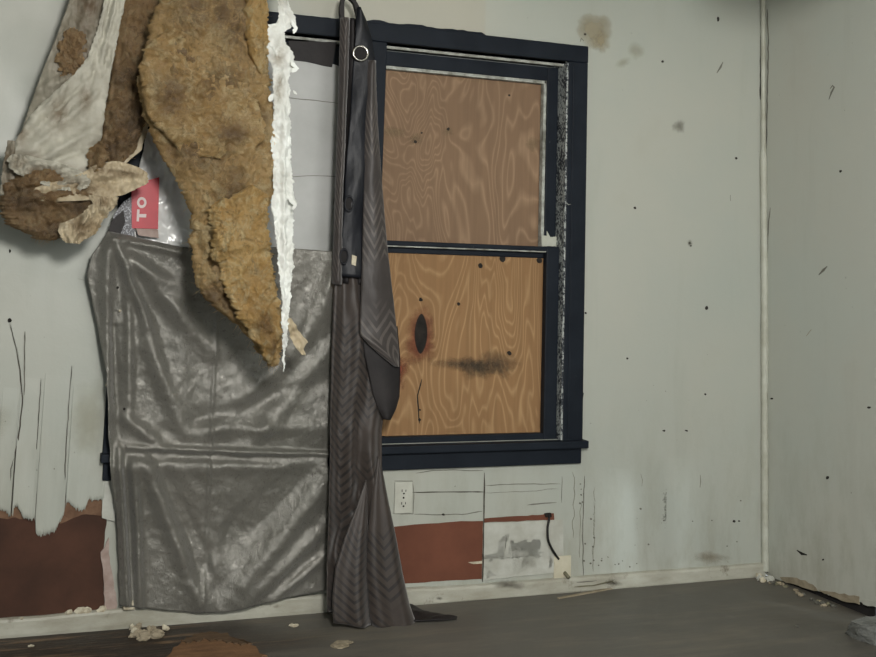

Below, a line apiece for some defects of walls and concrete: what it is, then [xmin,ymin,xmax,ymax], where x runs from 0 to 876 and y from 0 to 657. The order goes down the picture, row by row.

peeling [0,374,135,618]
peeling [394,513,554,583]